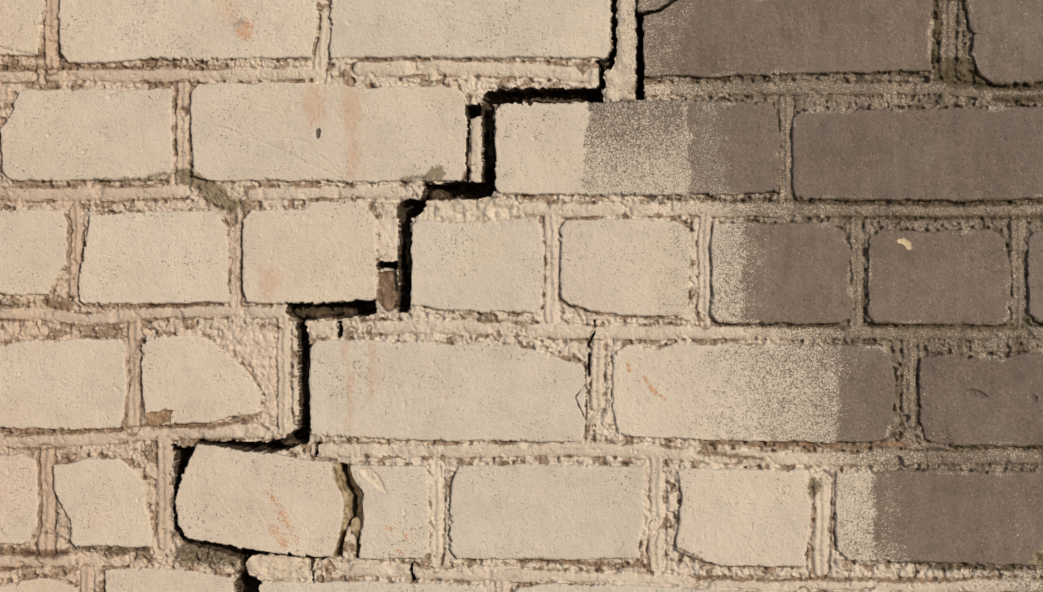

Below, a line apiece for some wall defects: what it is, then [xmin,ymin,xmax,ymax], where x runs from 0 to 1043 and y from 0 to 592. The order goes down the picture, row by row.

crack [171,0,678,592]